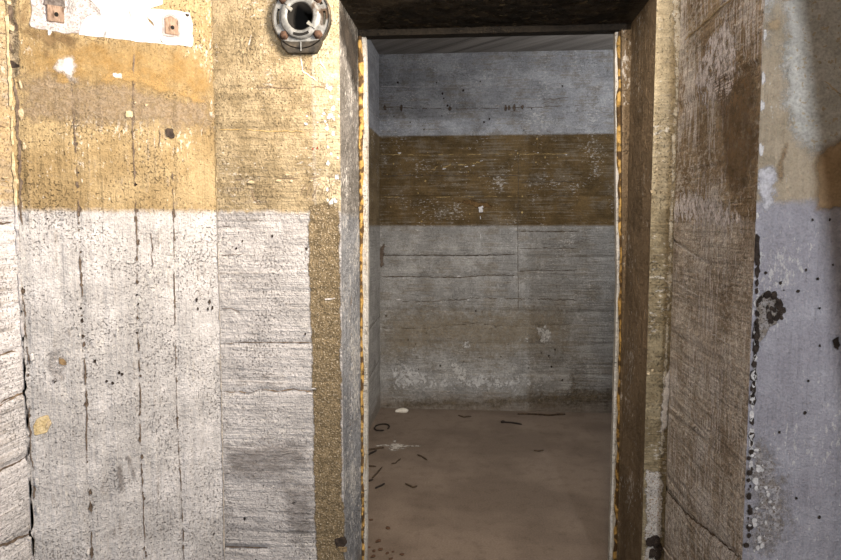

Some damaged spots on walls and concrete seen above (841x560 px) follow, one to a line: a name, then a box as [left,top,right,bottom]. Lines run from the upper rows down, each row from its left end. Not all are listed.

crack [0,78,27,225]
peeling [647,0,742,455]
peeling [756,147,787,219]
peeling [763,0,841,152]
crack [0,287,40,551]
spalling [744,234,786,553]